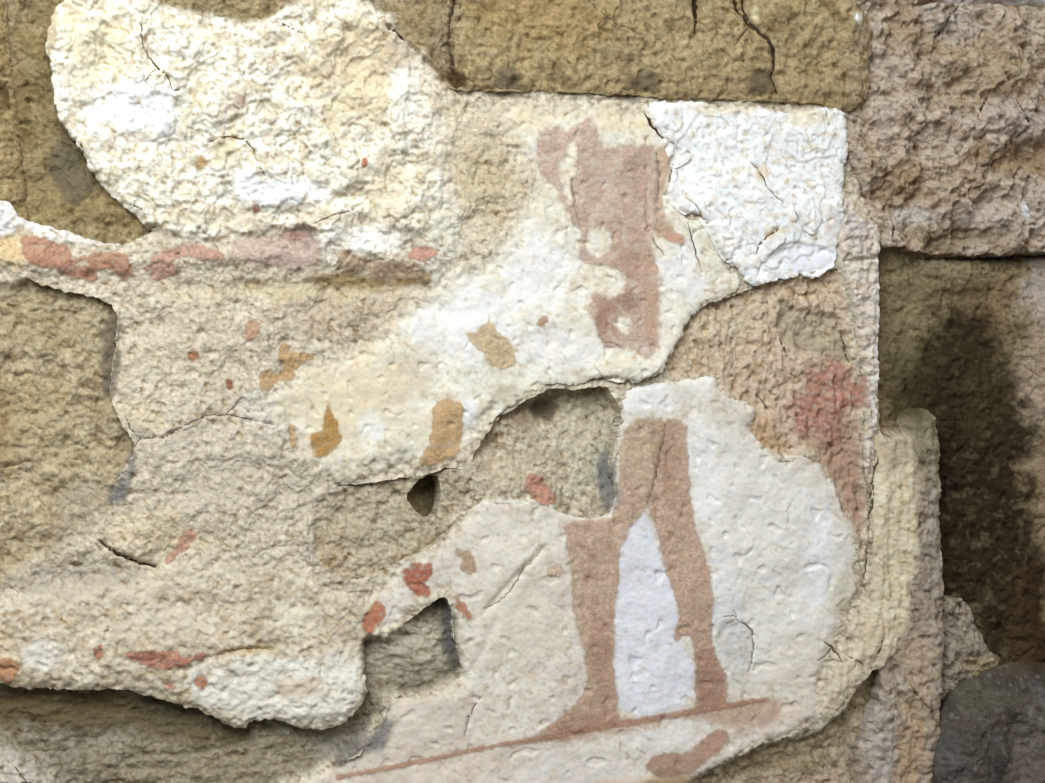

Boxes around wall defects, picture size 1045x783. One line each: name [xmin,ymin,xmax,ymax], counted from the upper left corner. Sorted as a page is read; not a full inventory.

crack [449,0,457,77]
crack [691,0,699,35]
crack [733,0,783,104]
peeling [306,100,872,584]
flaking render [0,276,133,599]
crack [125,393,275,447]
water stain [888,312,1045,667]
crack [99,540,156,567]
flaking render [0,597,459,783]